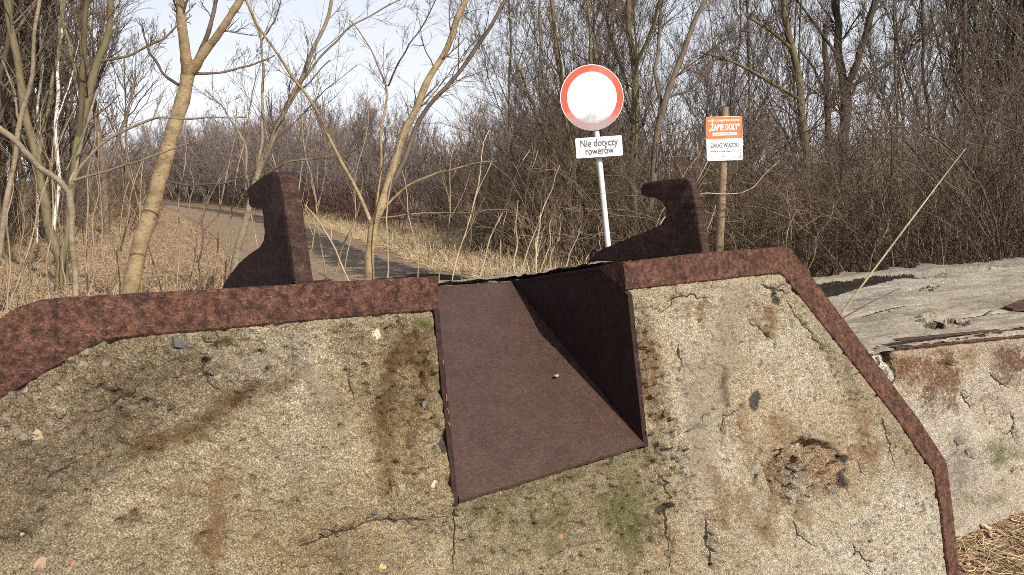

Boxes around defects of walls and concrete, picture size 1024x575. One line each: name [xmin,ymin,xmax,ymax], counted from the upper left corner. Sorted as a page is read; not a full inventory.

crack [663,293,709,311]
rust [891,327,1024,406]
spalling [762,438,846,506]
crack [297,507,458,571]